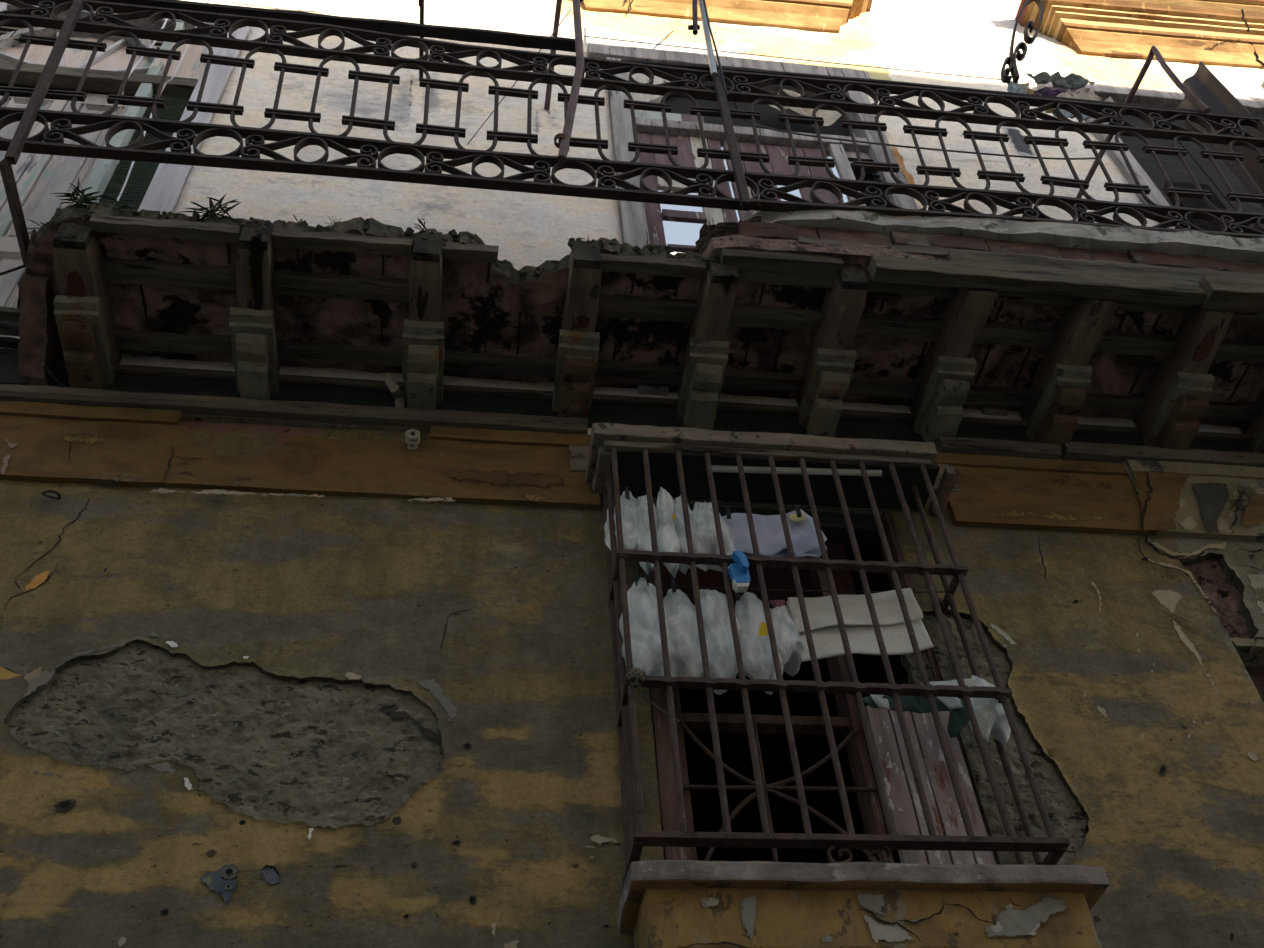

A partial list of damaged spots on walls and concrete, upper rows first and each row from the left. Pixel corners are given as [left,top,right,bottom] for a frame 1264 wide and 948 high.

crack [1241,9,1264,65]
crack [5,499,89,608]
crack [1137,466,1204,562]
flaking render [1142,483,1264,653]
crack [1230,486,1264,569]
peeling [1151,589,1219,694]
spalling [0,632,459,840]
spalling [905,614,1087,865]
peeling [856,893,919,943]
peeling [984,896,1067,938]